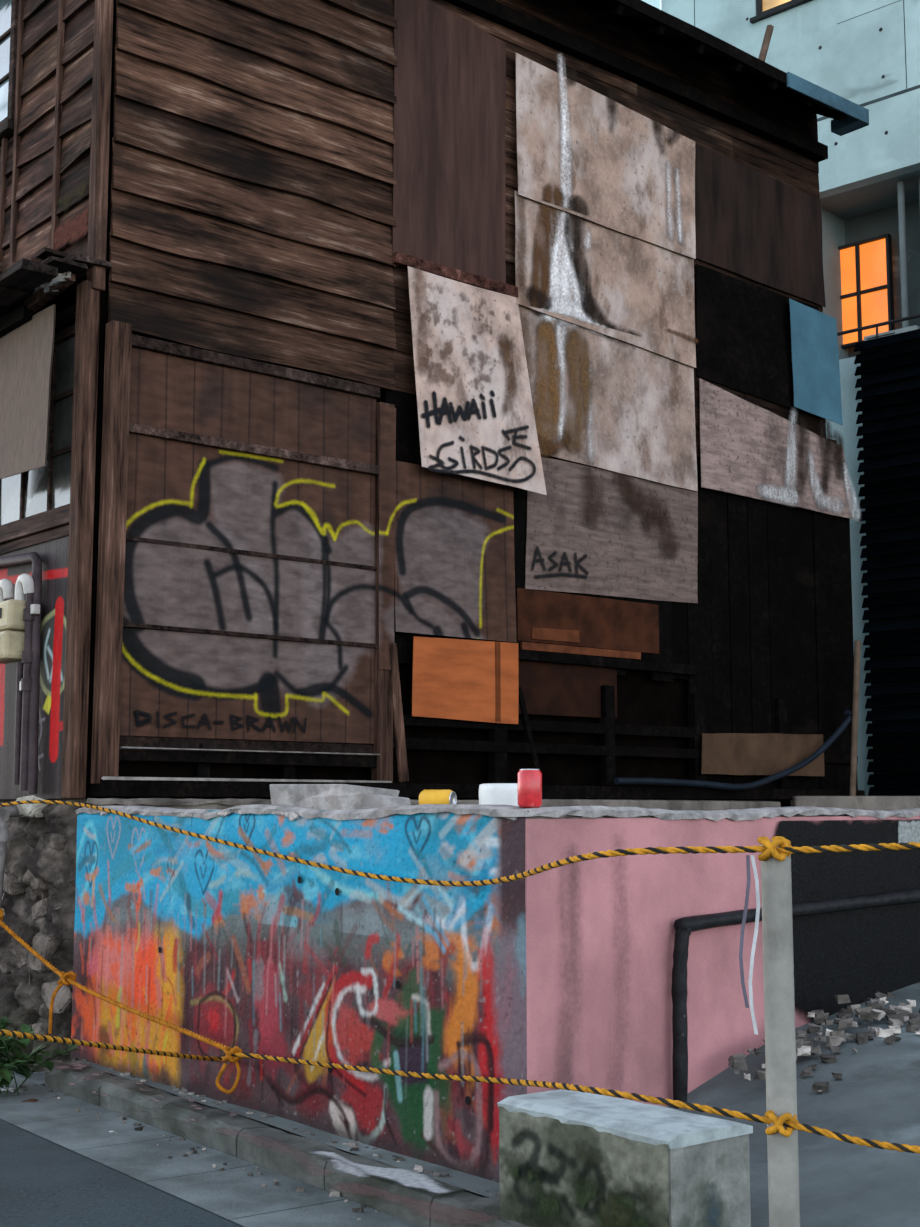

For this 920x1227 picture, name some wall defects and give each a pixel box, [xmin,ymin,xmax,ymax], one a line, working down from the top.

damp [608,89,616,129]
damp [654,115,683,242]
damp [541,54,605,444]